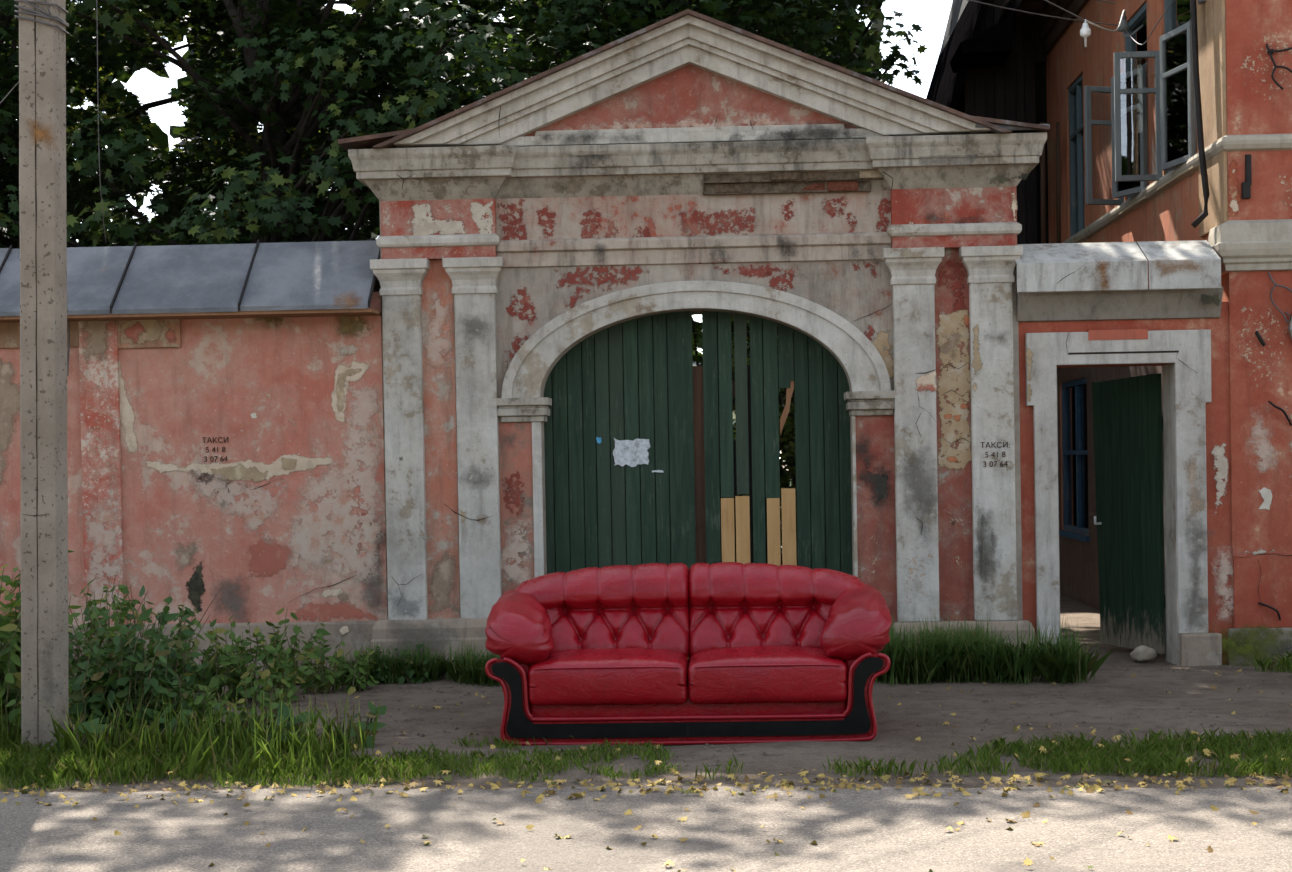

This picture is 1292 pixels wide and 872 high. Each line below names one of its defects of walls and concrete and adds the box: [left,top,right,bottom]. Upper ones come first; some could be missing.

peeling [580,208,652,239]
spalling [679,170,891,236]
peeling [555,266,649,309]
peeling [915,259,982,471]
peeling [85,344,383,635]
peeling [1186,443,1228,516]
peeling [501,471,531,583]
peeling [1216,549,1274,618]